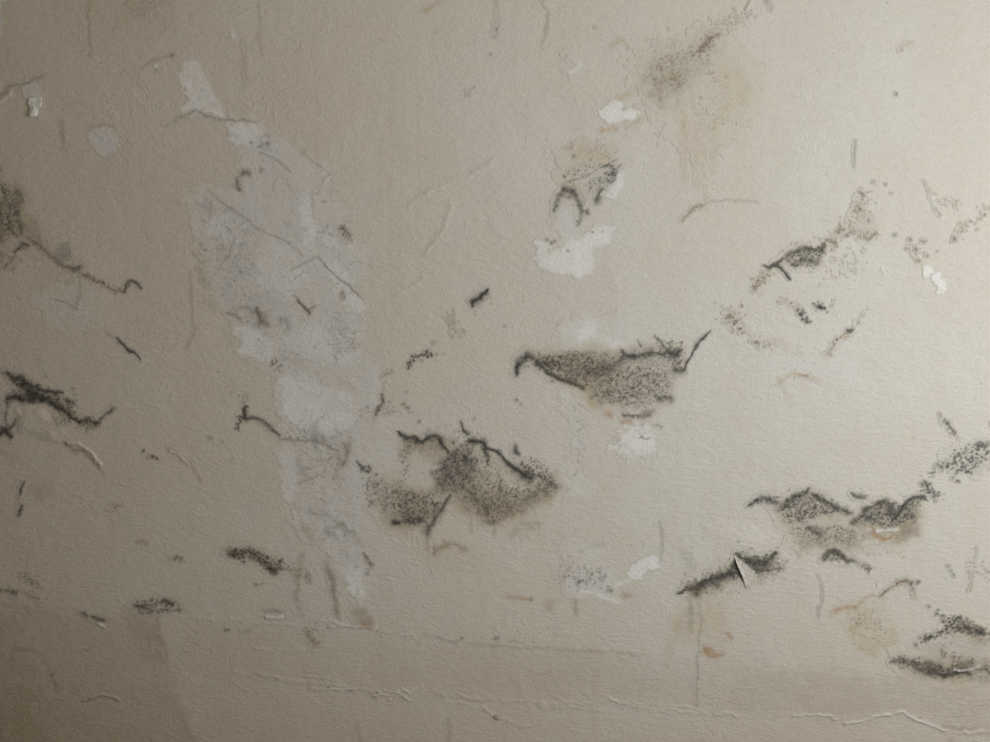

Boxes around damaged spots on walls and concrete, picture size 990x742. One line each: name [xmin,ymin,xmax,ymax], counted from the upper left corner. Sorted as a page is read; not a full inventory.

peeling [598,100,641,125]
damp [550,3,767,228]
damp [0,163,144,312]
peeling [527,203,619,280]
damp [749,179,940,297]
damp [0,365,119,465]
peeling [174,56,409,613]
damp [230,339,568,576]
peeling [606,420,664,464]
damp [510,301,805,426]
damp [777,295,837,326]
damp [0,410,990,742]